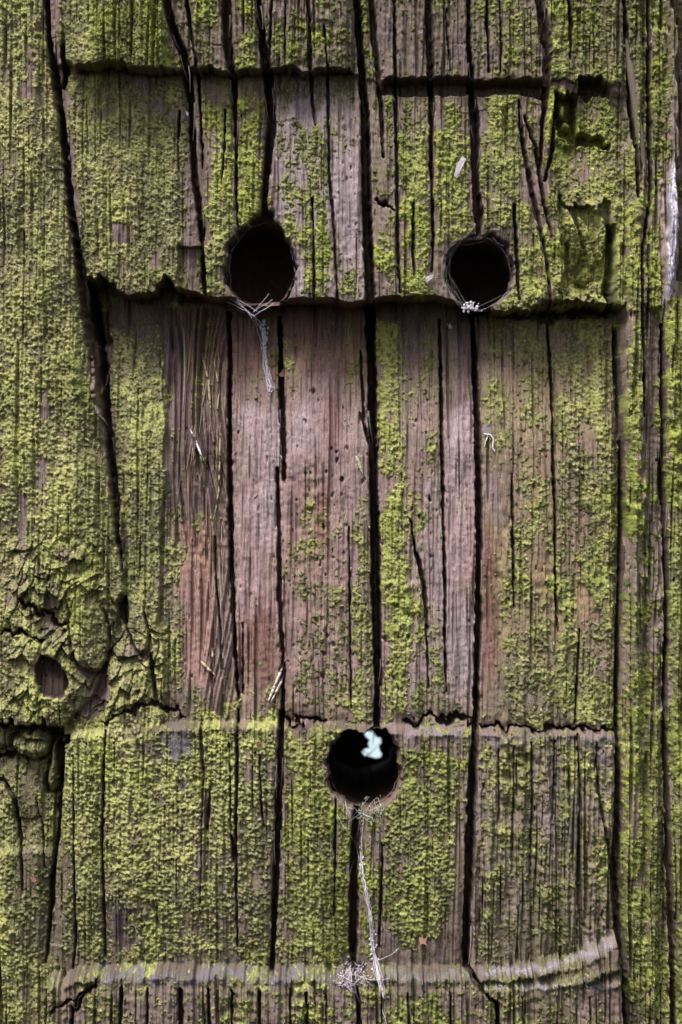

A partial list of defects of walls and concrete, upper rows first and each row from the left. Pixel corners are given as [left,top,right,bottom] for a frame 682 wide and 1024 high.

crack [45,0,124,574]
crack [348,0,676,1024]
crack [0,311,328,1024]
leakage [408,725,462,740]
leakage [479,735,612,816]
leakage [107,909,144,947]
leakage [488,941,615,990]